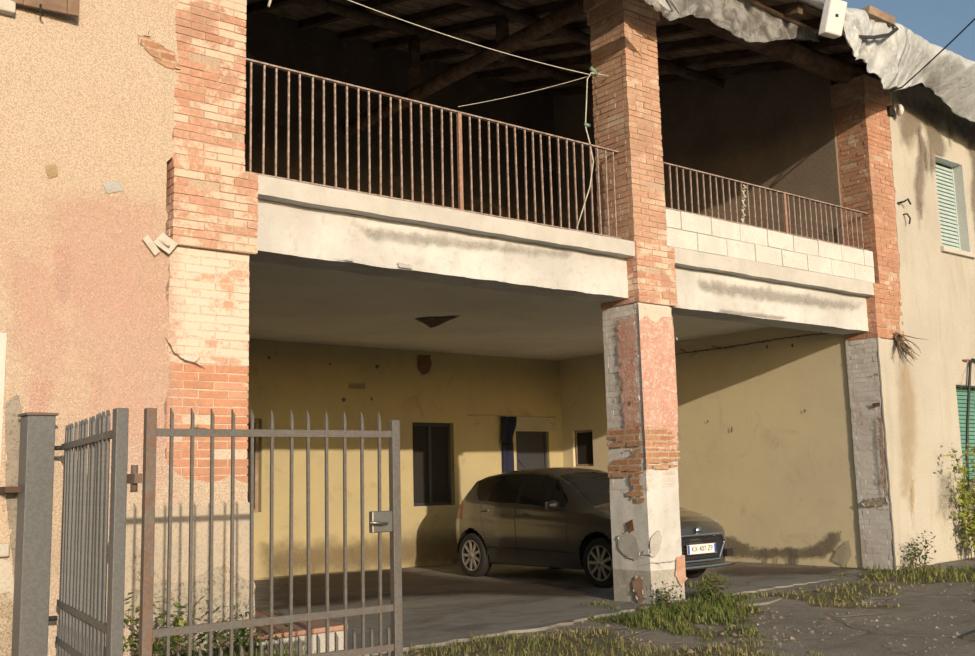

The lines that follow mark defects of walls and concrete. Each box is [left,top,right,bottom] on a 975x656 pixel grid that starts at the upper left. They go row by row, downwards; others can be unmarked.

flaking render [138,34,181,69]
damp [900,97,975,217]
peeling [606,303,680,503]
peeling [618,519,662,560]
damp [726,532,841,565]
spalling [675,555,687,588]